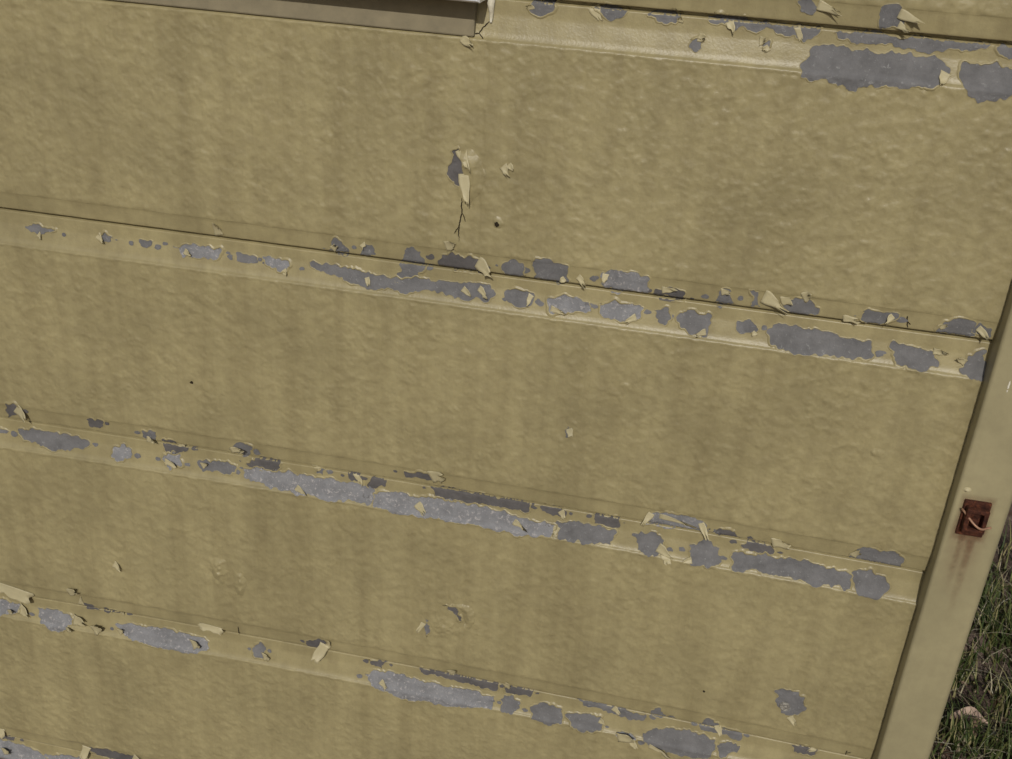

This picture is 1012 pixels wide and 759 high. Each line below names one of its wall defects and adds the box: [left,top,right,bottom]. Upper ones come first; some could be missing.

peeling [525,0,560,19]
peeling [588,1,631,22]
peeling [646,8,684,26]
peeling [688,0,1012,104]
peeling [445,145,470,204]
peeling [129,235,992,382]
peeling [0,400,98,453]
peeling [134,429,622,546]
peeling [631,510,906,600]
peeling [0,583,223,654]
peeling [0,728,139,759]
peeling [357,659,749,759]